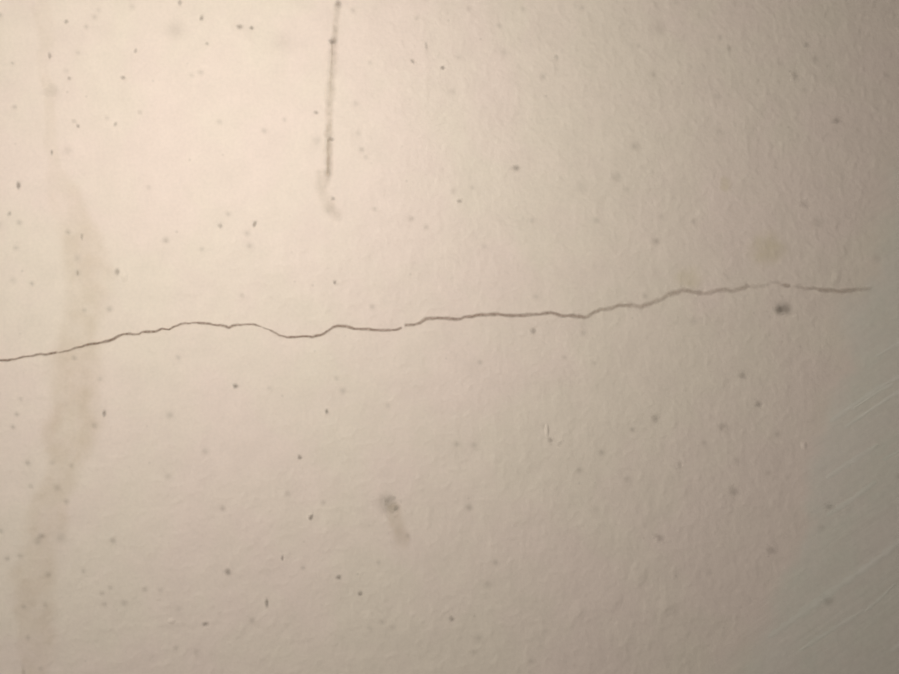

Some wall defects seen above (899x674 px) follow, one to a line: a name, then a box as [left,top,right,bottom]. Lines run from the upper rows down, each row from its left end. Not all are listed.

crack [80,322,236,347]
crack [283,324,415,338]